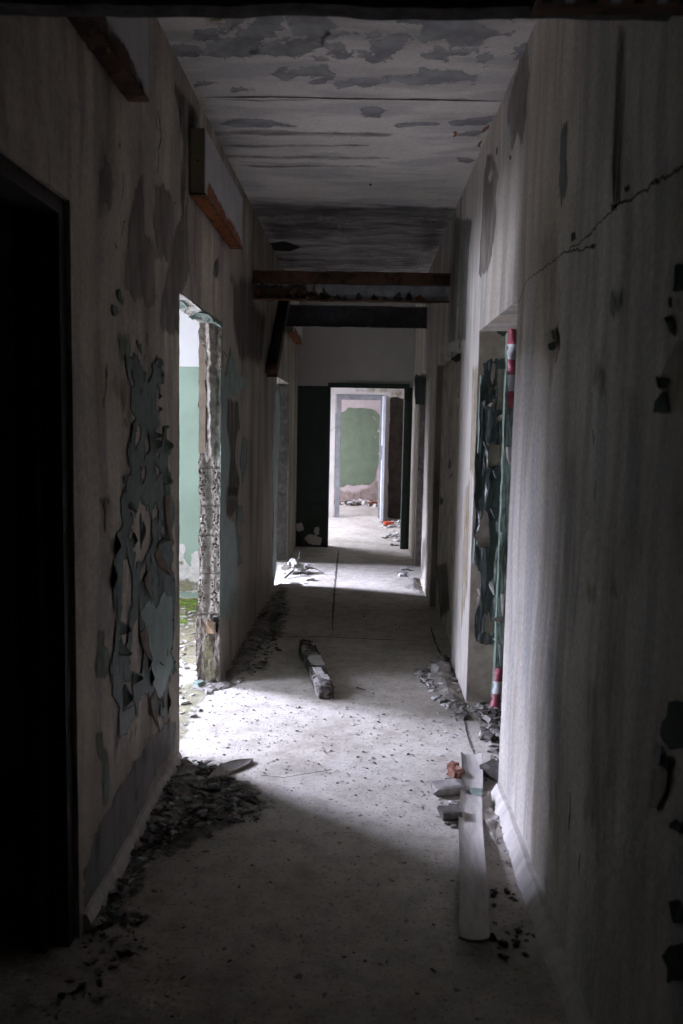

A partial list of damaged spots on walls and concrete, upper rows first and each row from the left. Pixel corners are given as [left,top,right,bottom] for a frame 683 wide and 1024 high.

water stain [215,119,315,167]
water stain [362,107,385,117]
rust [192,184,242,249]
water stain [254,152,498,358]
crack [518,165,683,304]
peeling [95,290,247,738]
peeling [467,331,512,703]
peeling [648,699,683,808]
peeling [661,943,683,983]